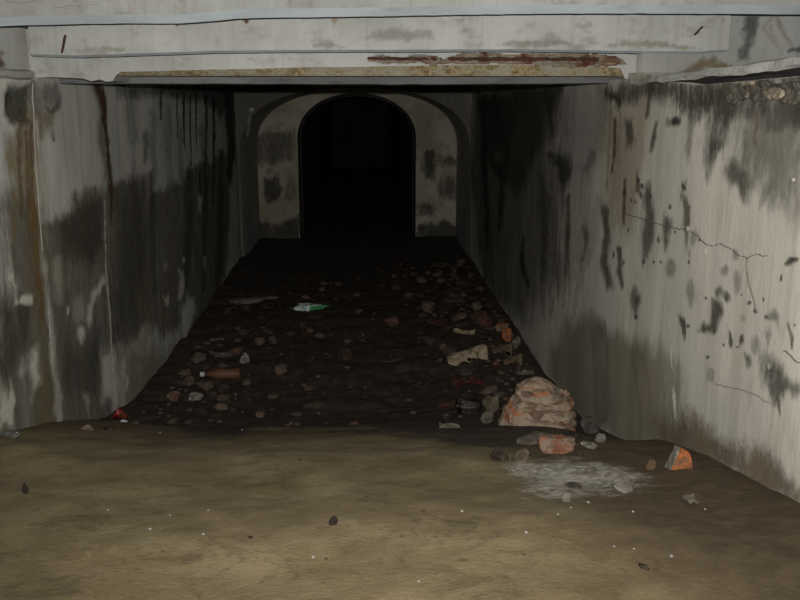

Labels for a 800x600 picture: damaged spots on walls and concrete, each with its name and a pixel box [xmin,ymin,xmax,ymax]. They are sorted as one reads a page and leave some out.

corrosion [95,85,113,215]
leakage [605,76,800,197]
spalling [723,80,800,105]
leakage [0,84,235,433]
leakage [582,198,624,290]
leakage [623,178,671,264]
leakage [682,185,690,239]
crack [626,188,767,312]
leakage [553,283,679,440]
crack [714,382,774,405]